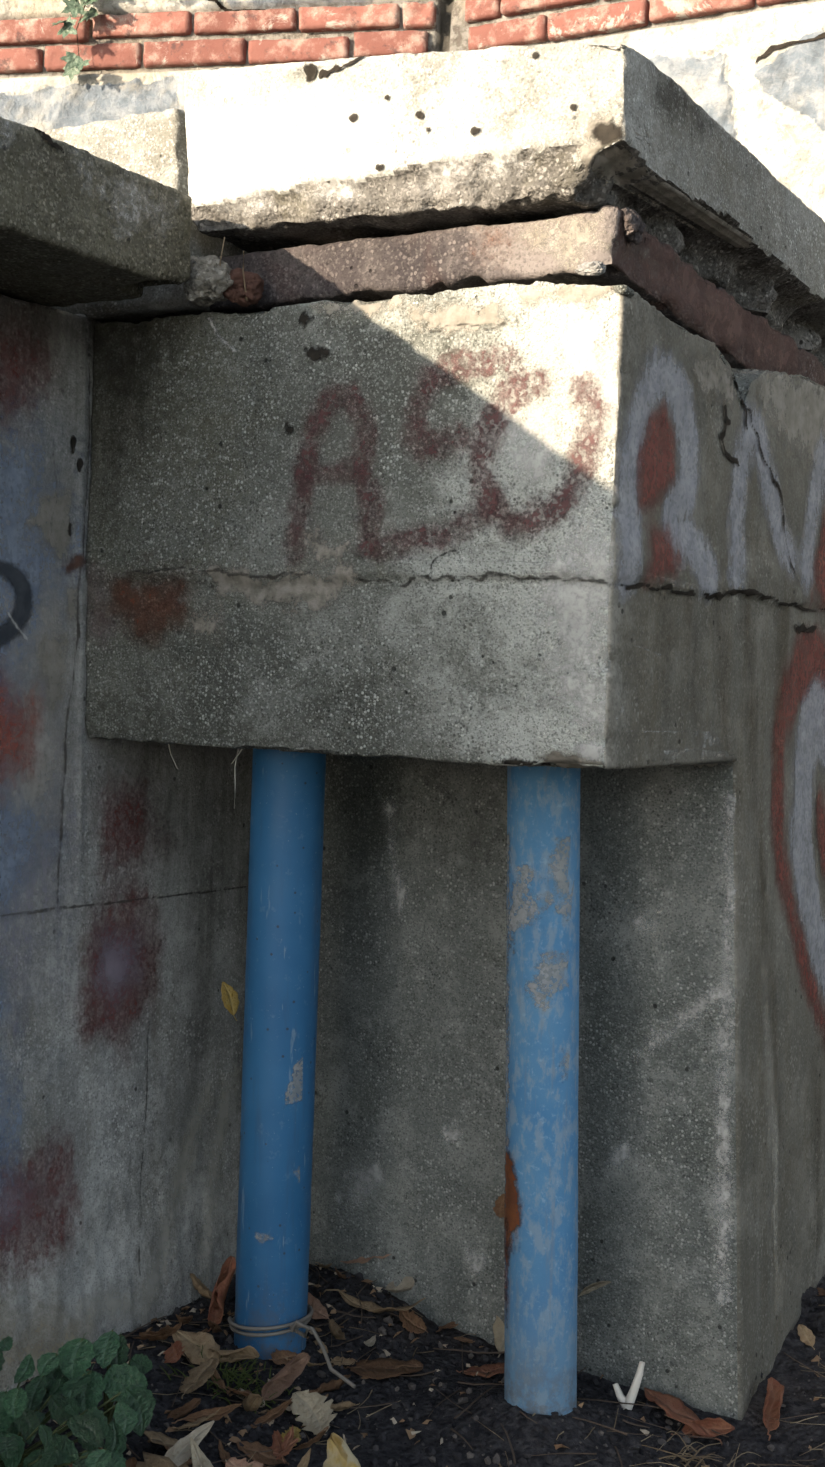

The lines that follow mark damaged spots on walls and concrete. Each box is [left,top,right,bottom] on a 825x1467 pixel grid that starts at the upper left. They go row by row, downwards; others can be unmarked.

water stain [204,79,368,215]
spalling [576,114,755,252]
spalling [685,352,825,465]
crack [136,566,310,579]
crack [359,374,823,633]
rust [504,1151,521,1313]